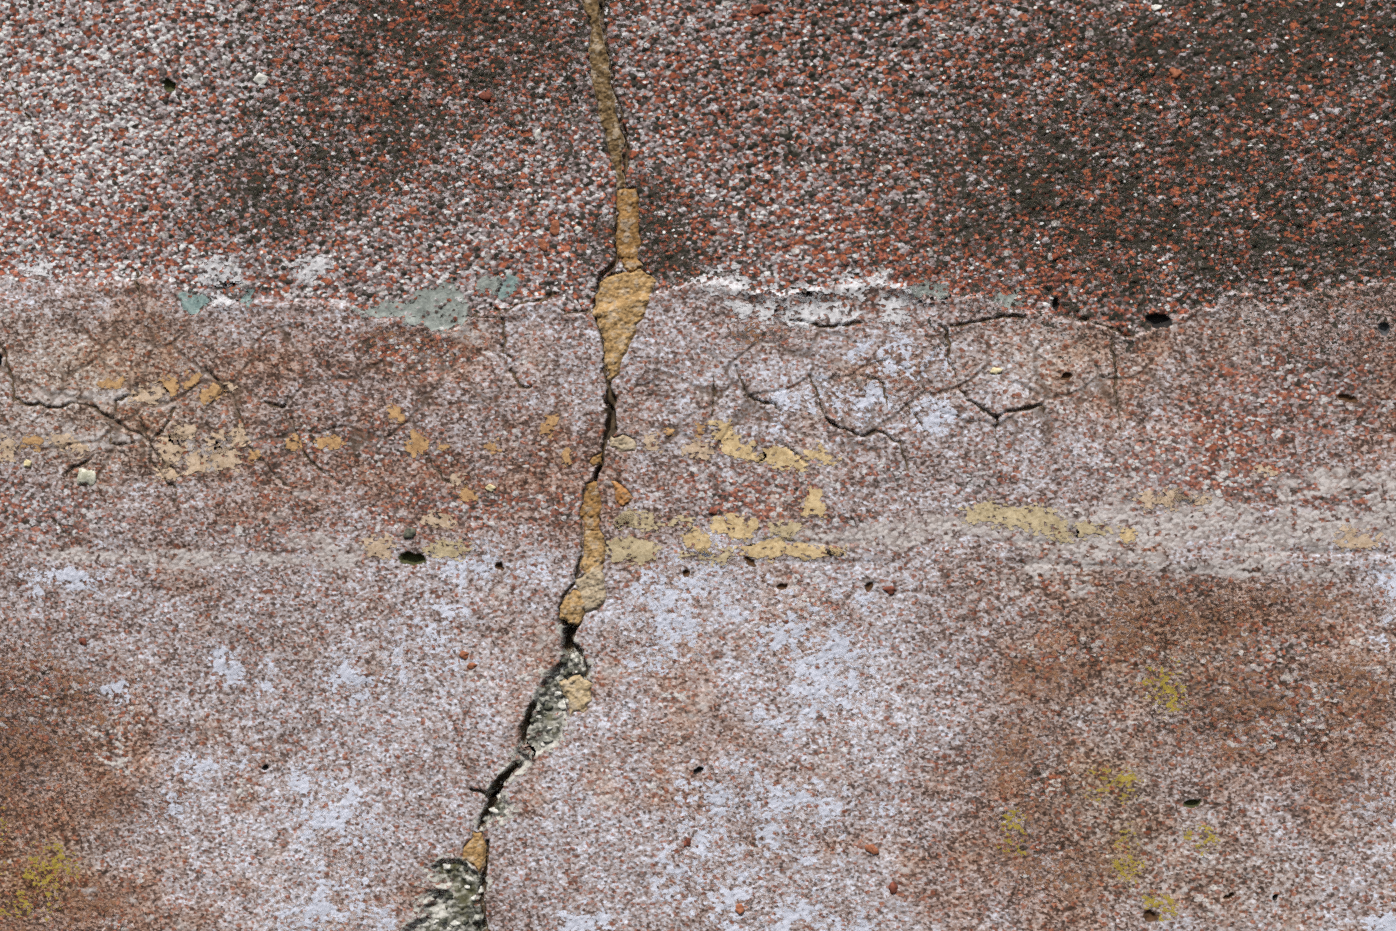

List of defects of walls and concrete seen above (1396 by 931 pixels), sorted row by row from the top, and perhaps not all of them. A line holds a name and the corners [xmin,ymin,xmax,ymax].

leakage [630,0,1396,435]
crack [0,344,181,503]
crack [465,0,631,678]
peeling [539,413,573,467]
peeling [605,419,848,567]
crack [711,368,801,460]
crack [790,320,863,329]
crack [808,374,925,471]
crack [938,315,1045,453]
flaking render [473,624,594,832]
crack [470,702,536,931]
flaking render [400,853,493,931]